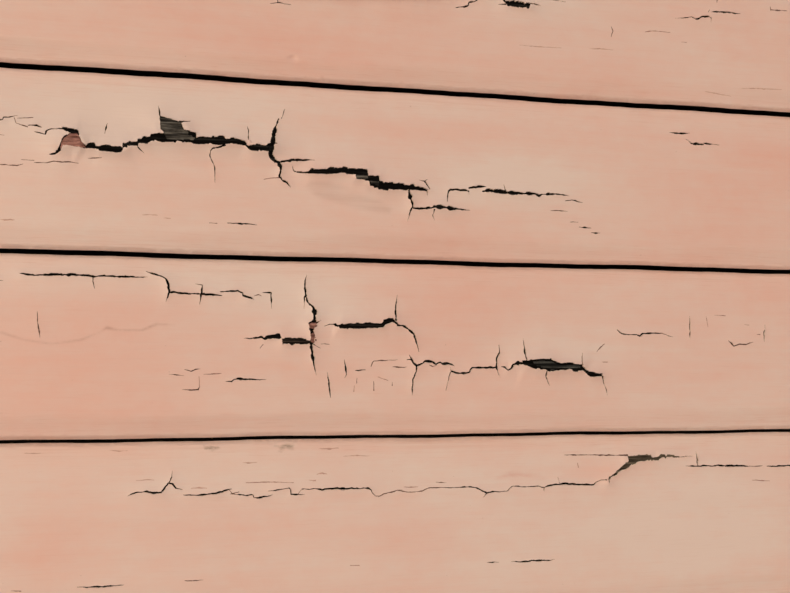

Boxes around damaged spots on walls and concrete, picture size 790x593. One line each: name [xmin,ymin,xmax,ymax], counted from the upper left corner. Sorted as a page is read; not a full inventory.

peeling [49,127,86,155]
crack [0,105,583,219]
crack [0,271,273,309]
crack [244,276,608,398]
crack [617,315,726,337]
crack [728,324,765,347]
crack [170,369,266,391]
crack [689,453,790,481]
crack [128,476,607,499]